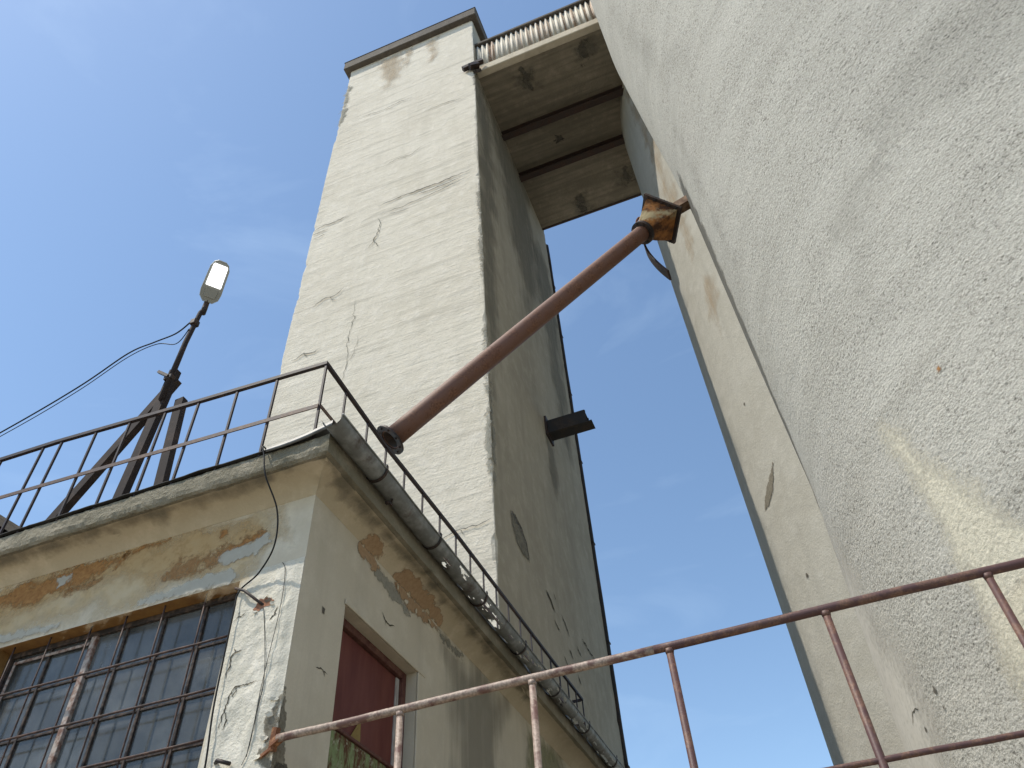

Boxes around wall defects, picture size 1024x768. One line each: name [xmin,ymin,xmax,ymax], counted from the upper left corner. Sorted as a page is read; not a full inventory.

crack [313,288,358,379]
spalling [252,594,274,614]
flaking render [358,534,463,657]
crack [217,649,258,731]